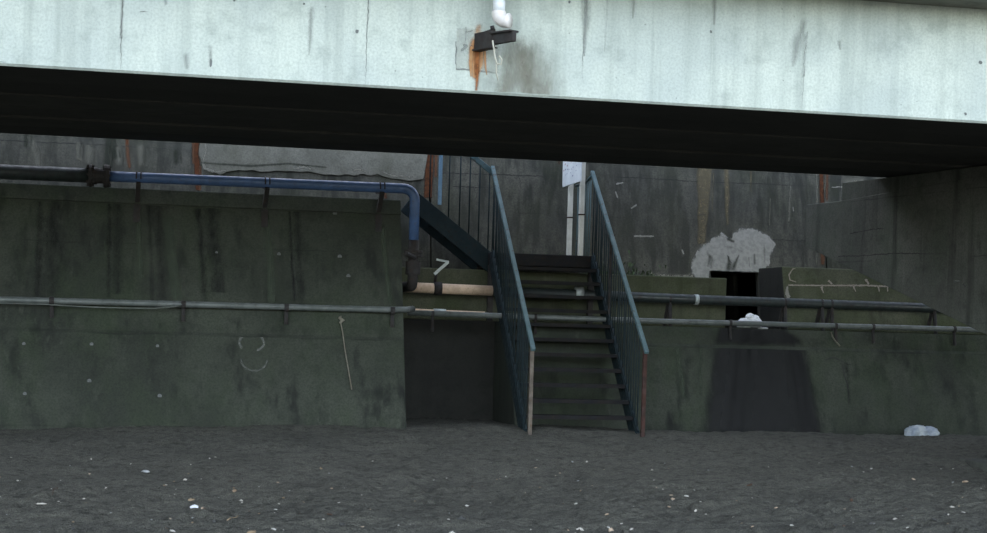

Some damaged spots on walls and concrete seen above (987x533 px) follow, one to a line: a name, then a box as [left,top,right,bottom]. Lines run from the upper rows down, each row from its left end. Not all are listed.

corrosion [469,27,487,90]
corrosion [192,143,201,190]